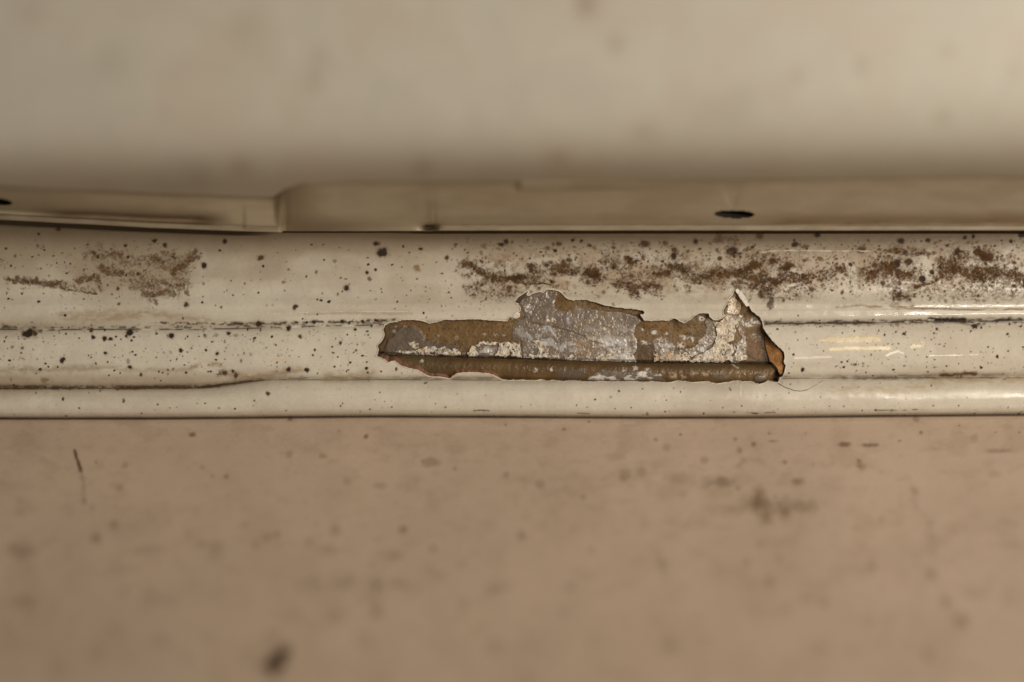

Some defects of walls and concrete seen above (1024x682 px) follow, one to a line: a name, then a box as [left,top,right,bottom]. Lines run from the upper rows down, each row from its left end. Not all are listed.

peeling [375,288,787,385]